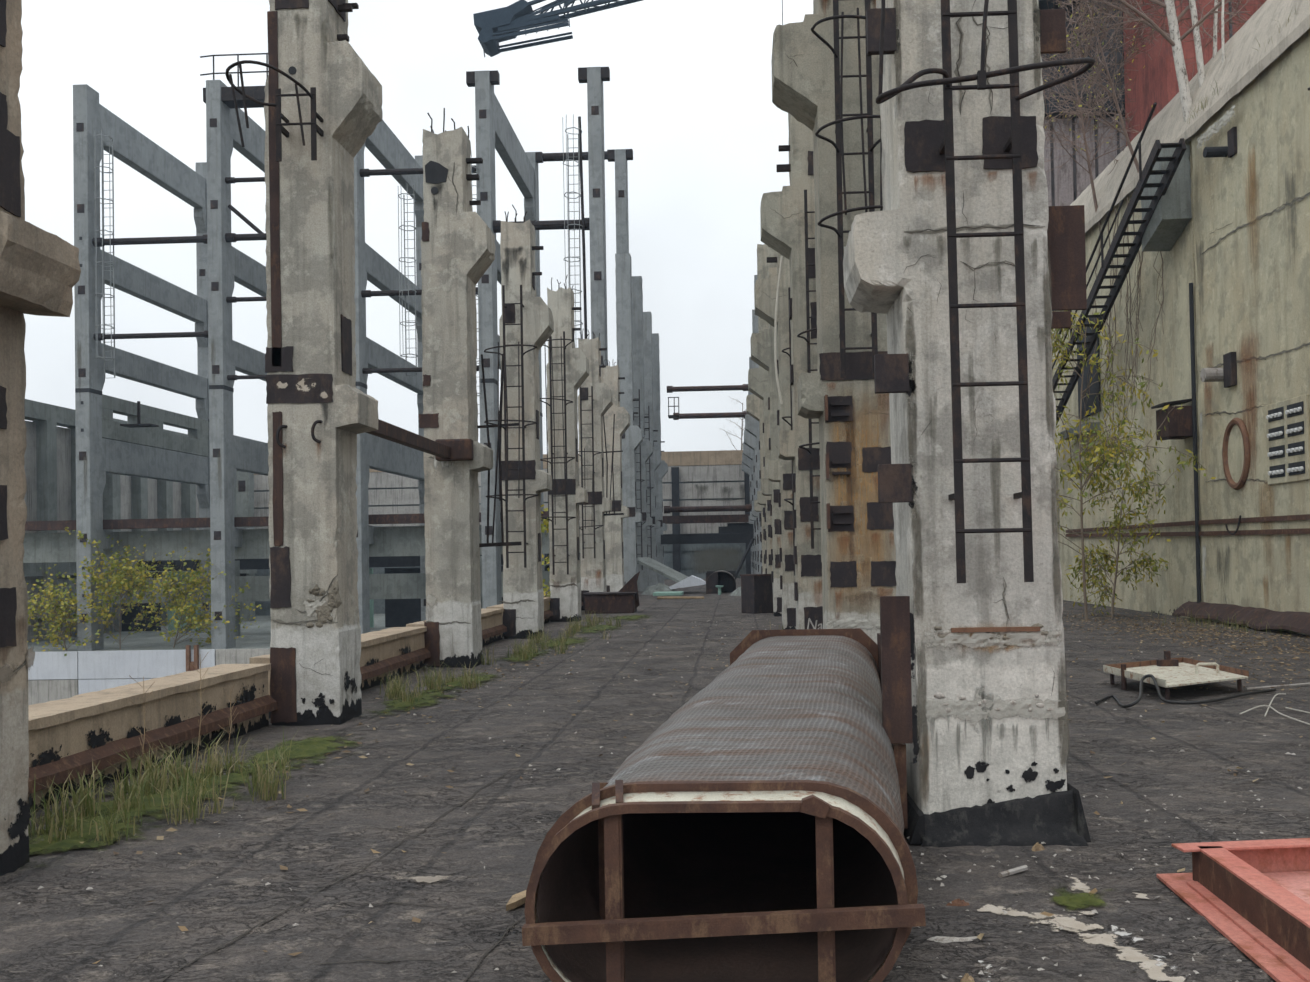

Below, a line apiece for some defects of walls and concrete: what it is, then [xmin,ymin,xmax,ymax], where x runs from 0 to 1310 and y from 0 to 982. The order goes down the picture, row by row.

crack [903,193,1045,337]
peeling [277,379,328,398]
spalling [303,579,342,628]